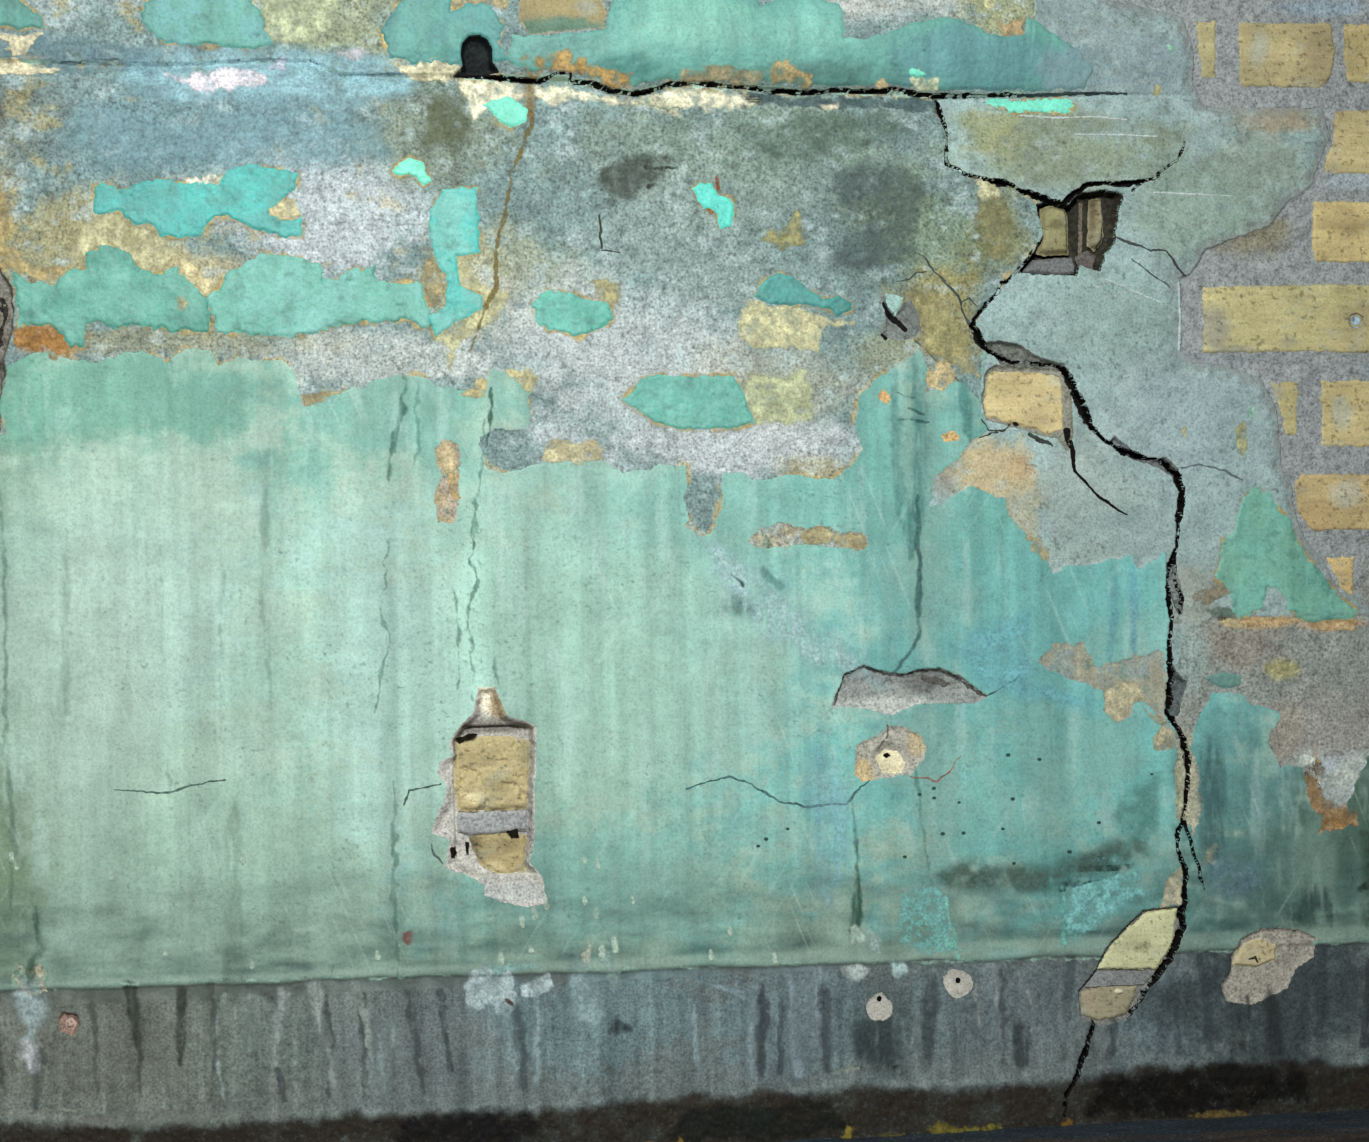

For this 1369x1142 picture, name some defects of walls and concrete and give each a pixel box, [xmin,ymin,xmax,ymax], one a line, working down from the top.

rust [469,87,538,351]
crack [51,21,1243,1019]
peeling [0,0,1369,836]
water stain [707,542,858,672]
water stain [884,494,922,682]
spalling [432,687,548,907]
water stain [0,937,1369,1142]
spalling [866,992,893,1021]
water stain [847,850,1146,1067]
crack [1063,1019,1095,1117]
spalling [1078,906,1181,1026]
spalling [1221,927,1317,1005]